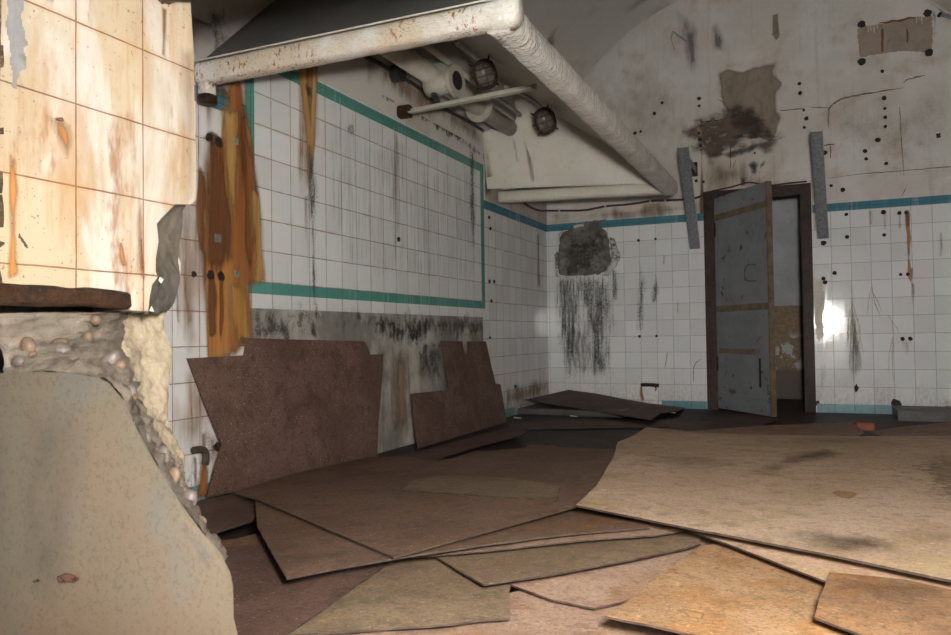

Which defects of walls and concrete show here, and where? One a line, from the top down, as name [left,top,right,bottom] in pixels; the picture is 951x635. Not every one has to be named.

peeling [857,9,933,66]
water stain [683,64,781,186]
spalling [0,205,233,596]
water stain [256,256,318,339]
water stain [356,313,483,373]
rust [186,66,951,635]